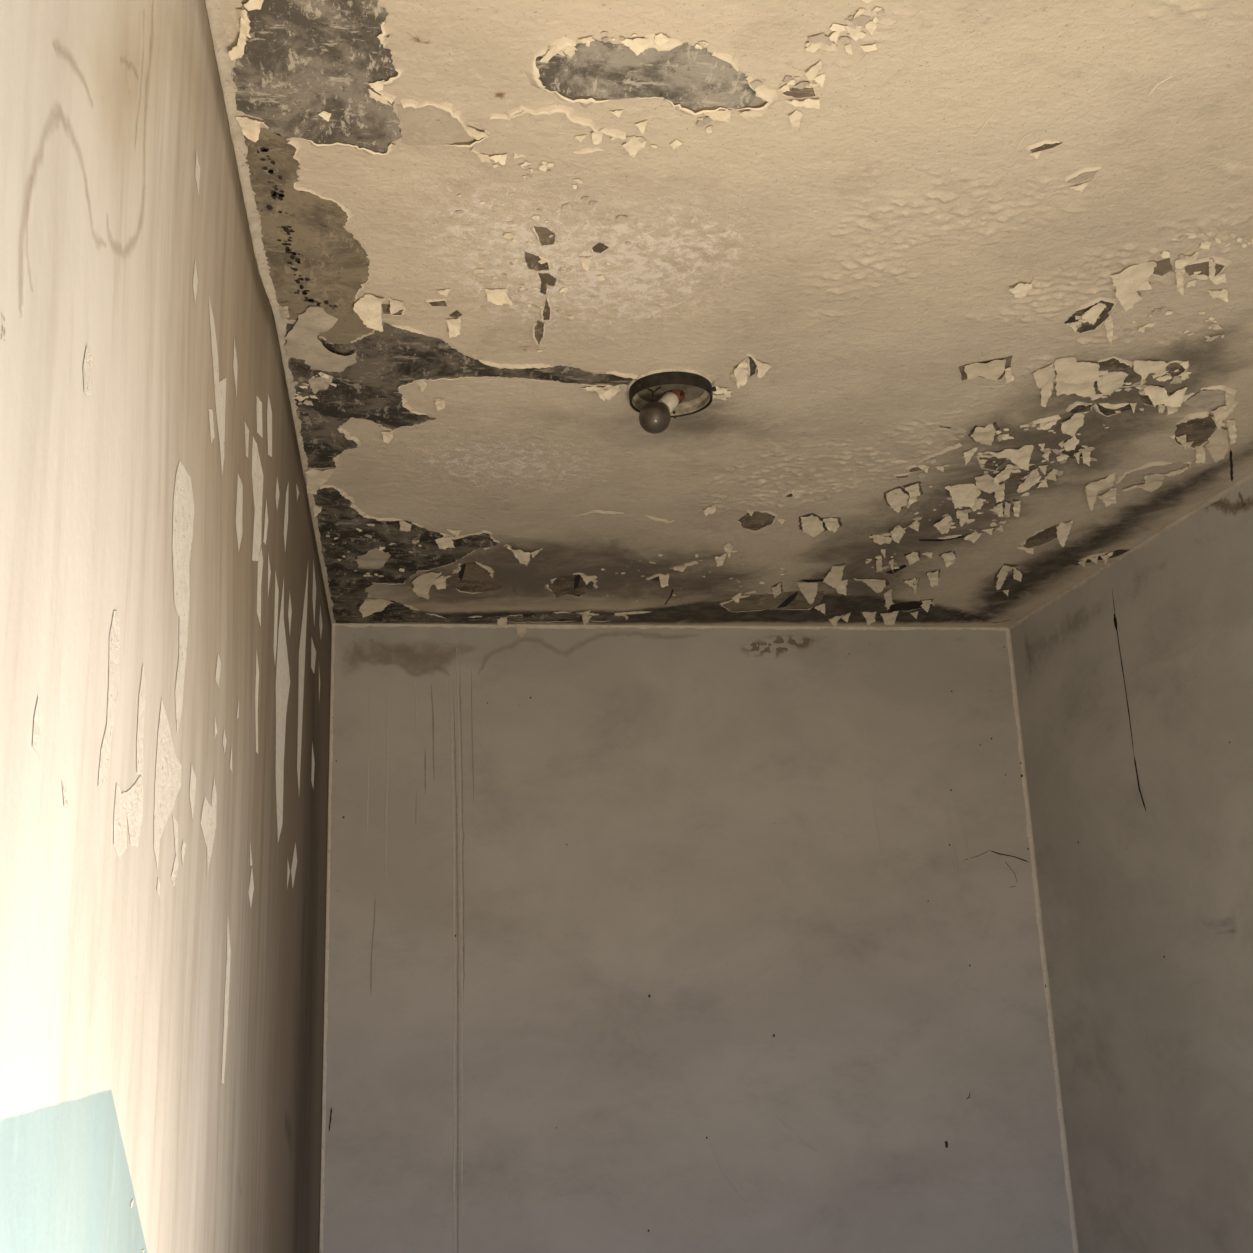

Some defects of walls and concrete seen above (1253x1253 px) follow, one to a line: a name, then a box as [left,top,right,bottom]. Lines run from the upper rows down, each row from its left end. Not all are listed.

damp [257,148,337,309]
peeling [228,0,1253,637]
damp [422,347,1227,624]
damp [751,638,809,652]
crack [1112,592,1146,811]